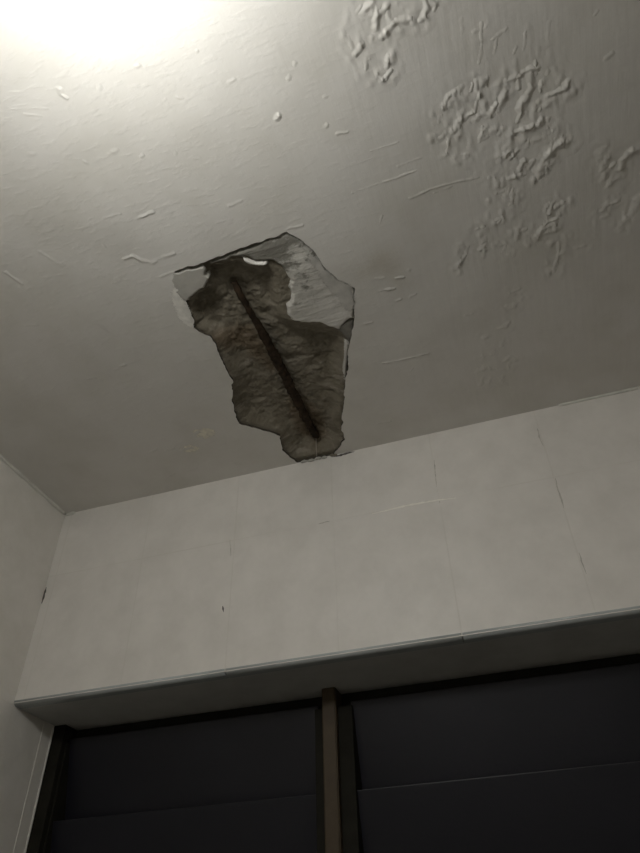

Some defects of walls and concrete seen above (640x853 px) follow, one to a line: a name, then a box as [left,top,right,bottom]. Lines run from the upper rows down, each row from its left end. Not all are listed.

spalling [170,232,356,463]